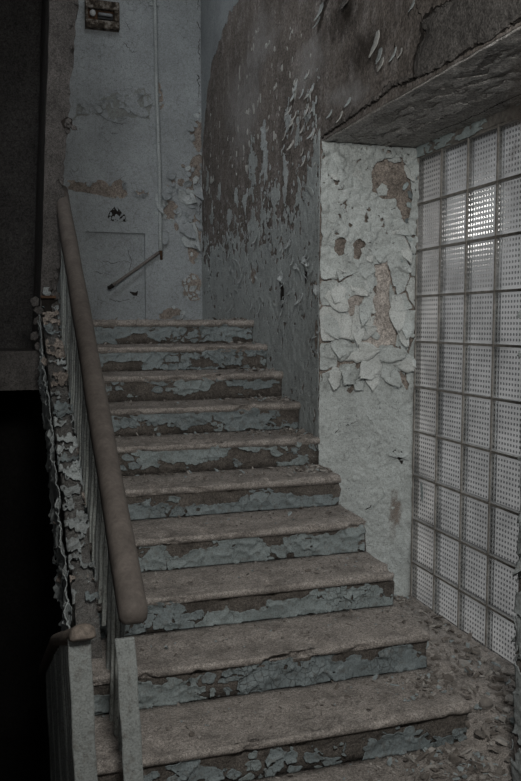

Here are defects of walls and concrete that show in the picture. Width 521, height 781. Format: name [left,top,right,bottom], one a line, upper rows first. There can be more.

crack [321,0,521,139]
peeling [65,0,521,475]
peeling [30,287,100,631]
peeling [128,488,339,520]
peeling [138,525,365,572]
peeling [98,613,107,639]
peeling [125,583,393,636]
peeling [509,424,521,781]
peeling [138,644,427,709]
peeling [144,742,347,781]
peeling [362,726,468,760]